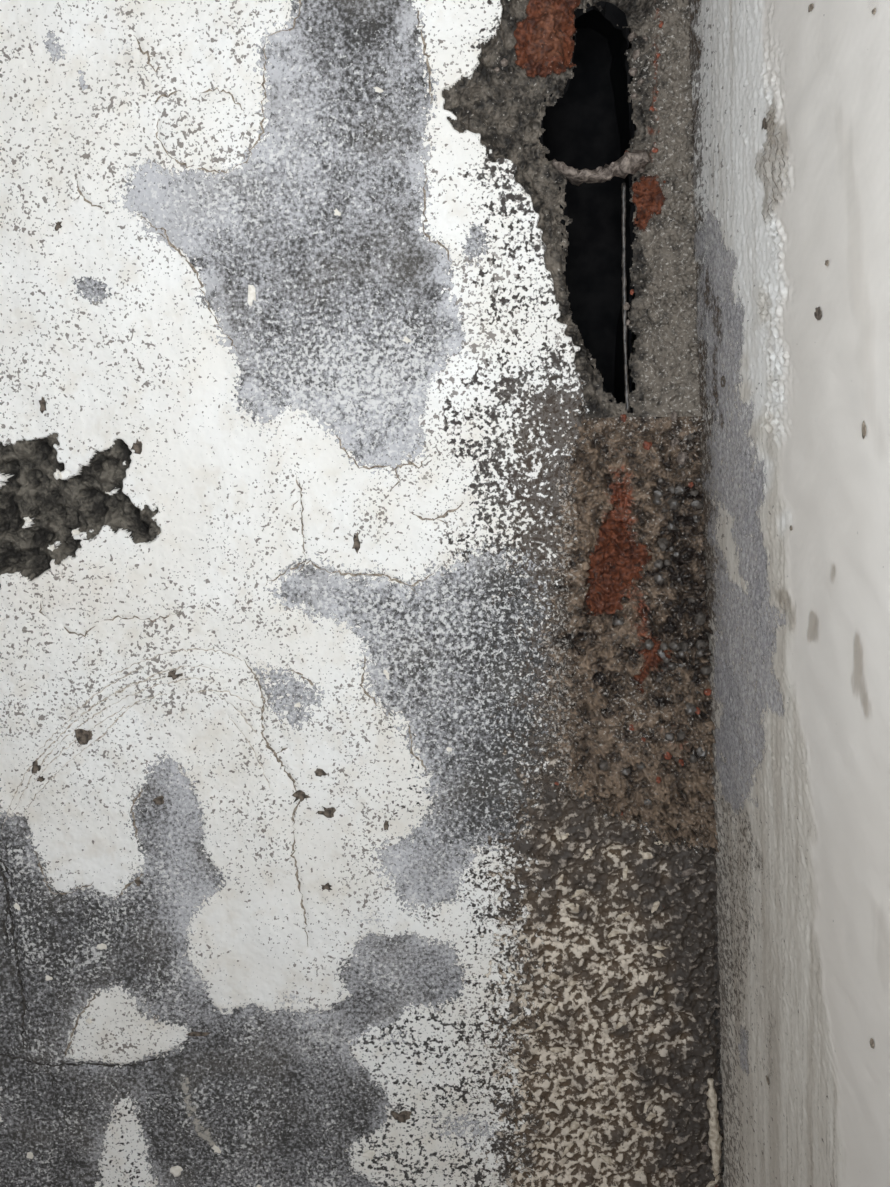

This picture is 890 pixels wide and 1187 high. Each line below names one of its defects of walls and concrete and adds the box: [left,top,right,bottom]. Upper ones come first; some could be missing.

peeling [42,29,67,61]
peeling [72,276,112,304]
peeling [113,0,719,918]
spalling [0,433,161,588]
peeling [75,729,92,745]
crack [245,661,308,946]
peeling [0,750,470,1187]
peeling [508,1002,540,1030]
peeling [431,1111,498,1150]